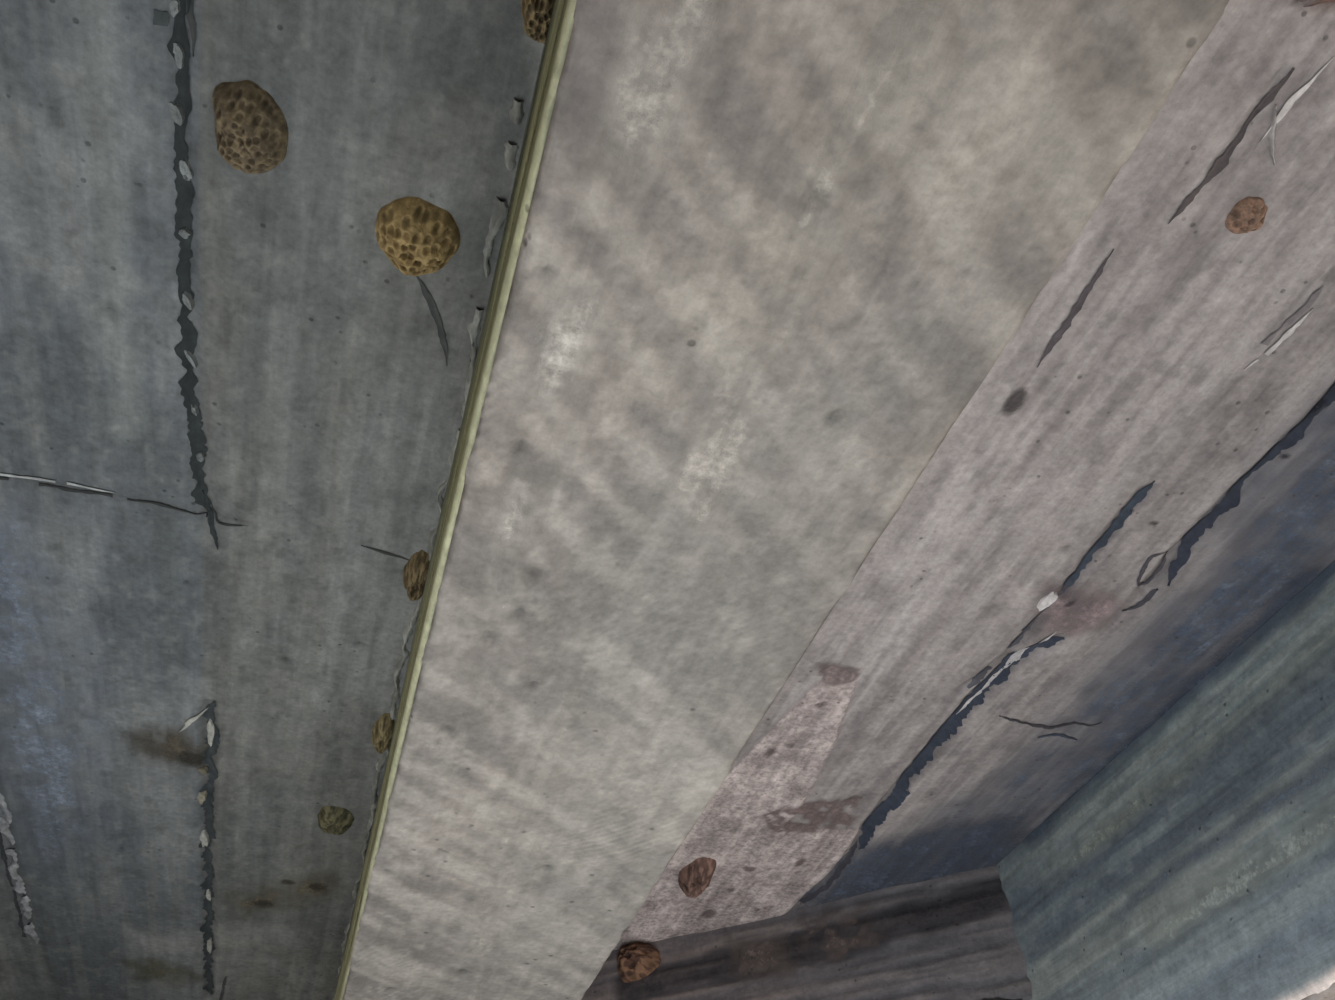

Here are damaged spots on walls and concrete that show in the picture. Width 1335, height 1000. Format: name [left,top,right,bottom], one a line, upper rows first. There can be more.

crack [1168,56,1334,224]
crack [0,0,243,550]
crack [1037,249,1114,368]
crack [1244,286,1324,370]
crack [1122,384,1335,611]
crack [798,481,1155,903]
crack [0,793,39,944]
crack [180,701,227,1000]